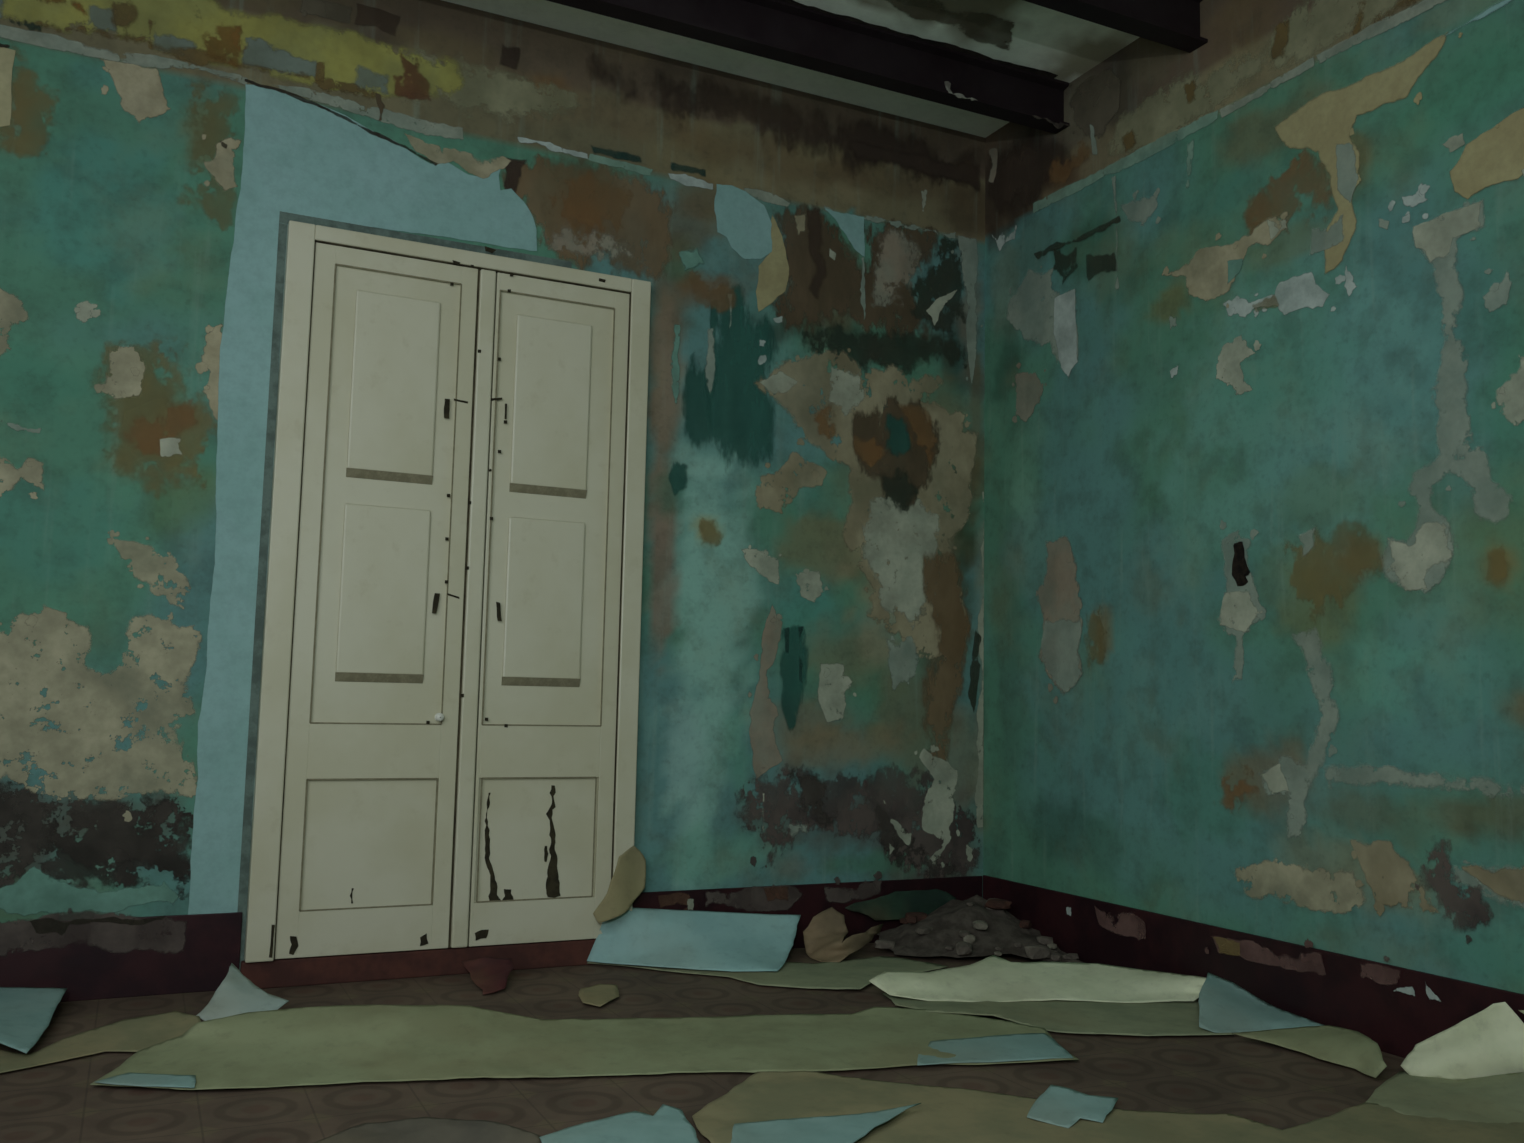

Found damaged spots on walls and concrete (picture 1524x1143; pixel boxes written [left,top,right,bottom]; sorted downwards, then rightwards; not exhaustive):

peeling [1162,32,1463,317]
peeling [1444,108,1524,199]
rust [105,343,211,489]
flaking render [742,348,977,690]
leakage [0,782,193,900]
peeling [0,530,202,822]
leakage [740,553,980,878]
flaking render [884,745,973,868]
flaking render [1219,520,1266,680]
peeling [1235,840,1438,916]
leakage [1259,630,1524,837]
leakage [1415,840,1524,944]